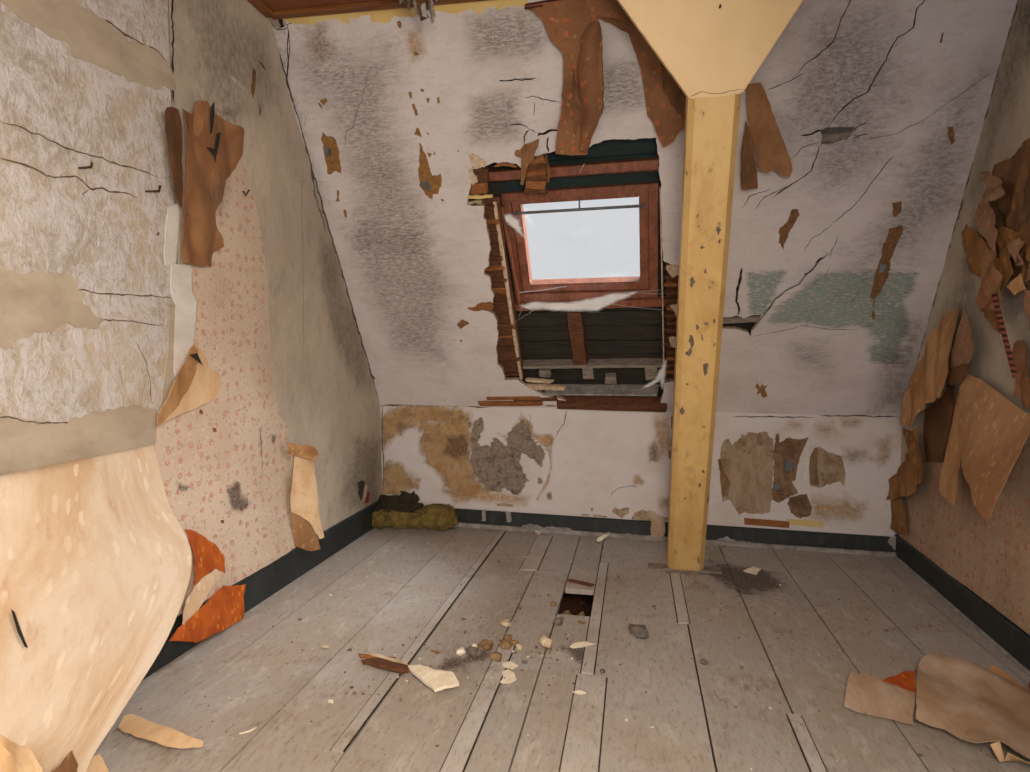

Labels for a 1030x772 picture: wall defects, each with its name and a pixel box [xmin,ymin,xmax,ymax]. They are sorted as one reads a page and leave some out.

peeling [269,7,418,29]
peeling [433,0,528,15]
crack [0,121,158,198]
crack [735,0,1018,336]
peeling [870,201,903,319]
crack [914,165,972,371]
flaking render [0,203,197,475]
flaking render [470,417,572,535]
flaking render [718,432,846,528]